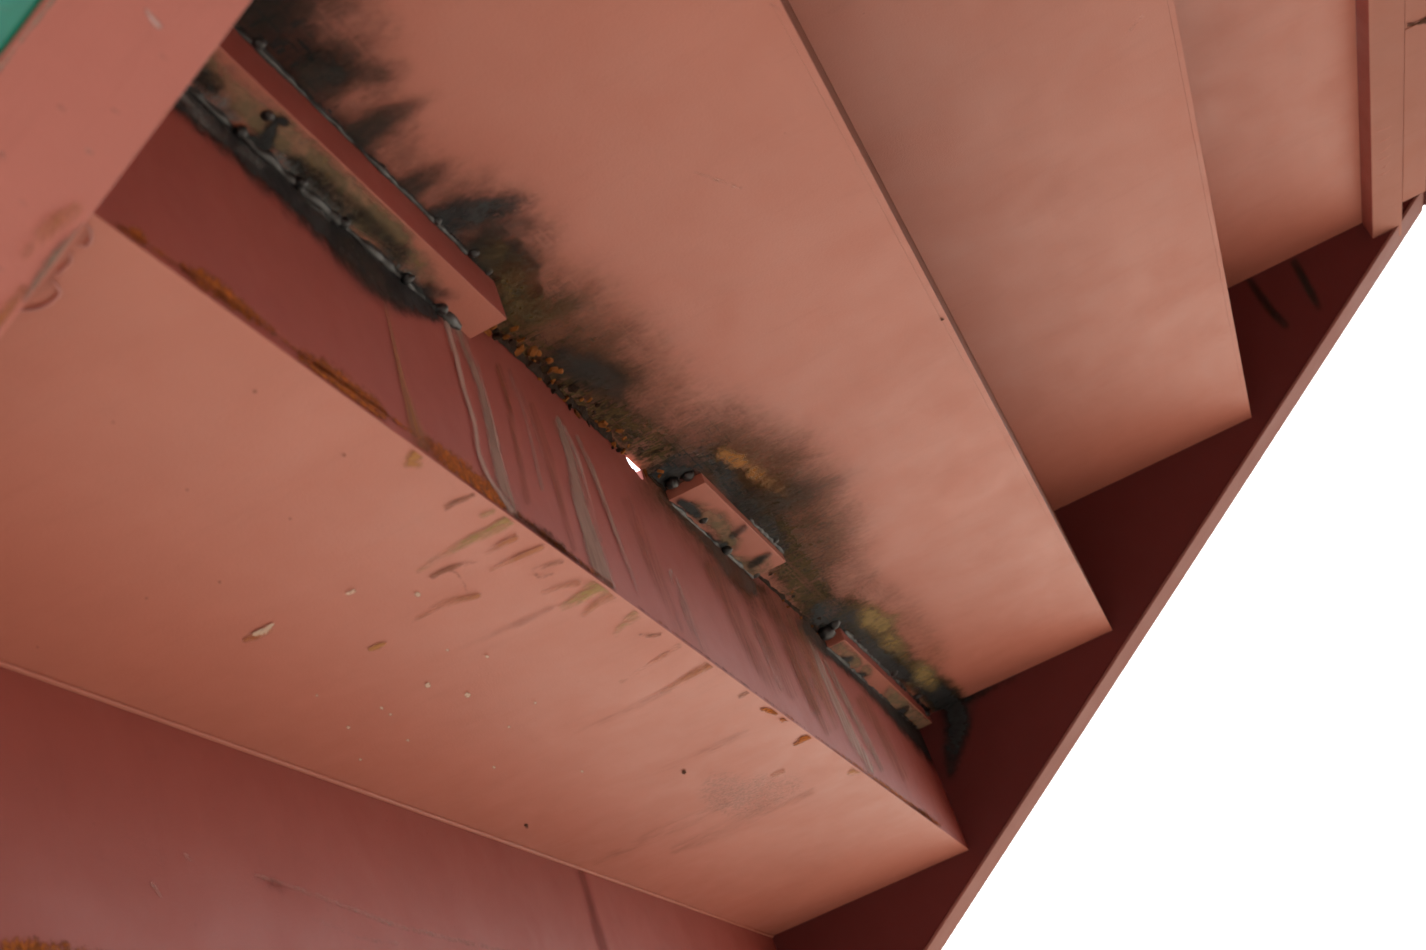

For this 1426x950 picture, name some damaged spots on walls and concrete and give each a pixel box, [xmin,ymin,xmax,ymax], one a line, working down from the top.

water stain [192,53,445,305]
corrosion [117,223,613,611]
water stain [445,321,518,546]
water stain [556,417,621,604]
water stain [677,499,770,575]
corrosion [761,699,940,827]
water stain [885,688,931,729]